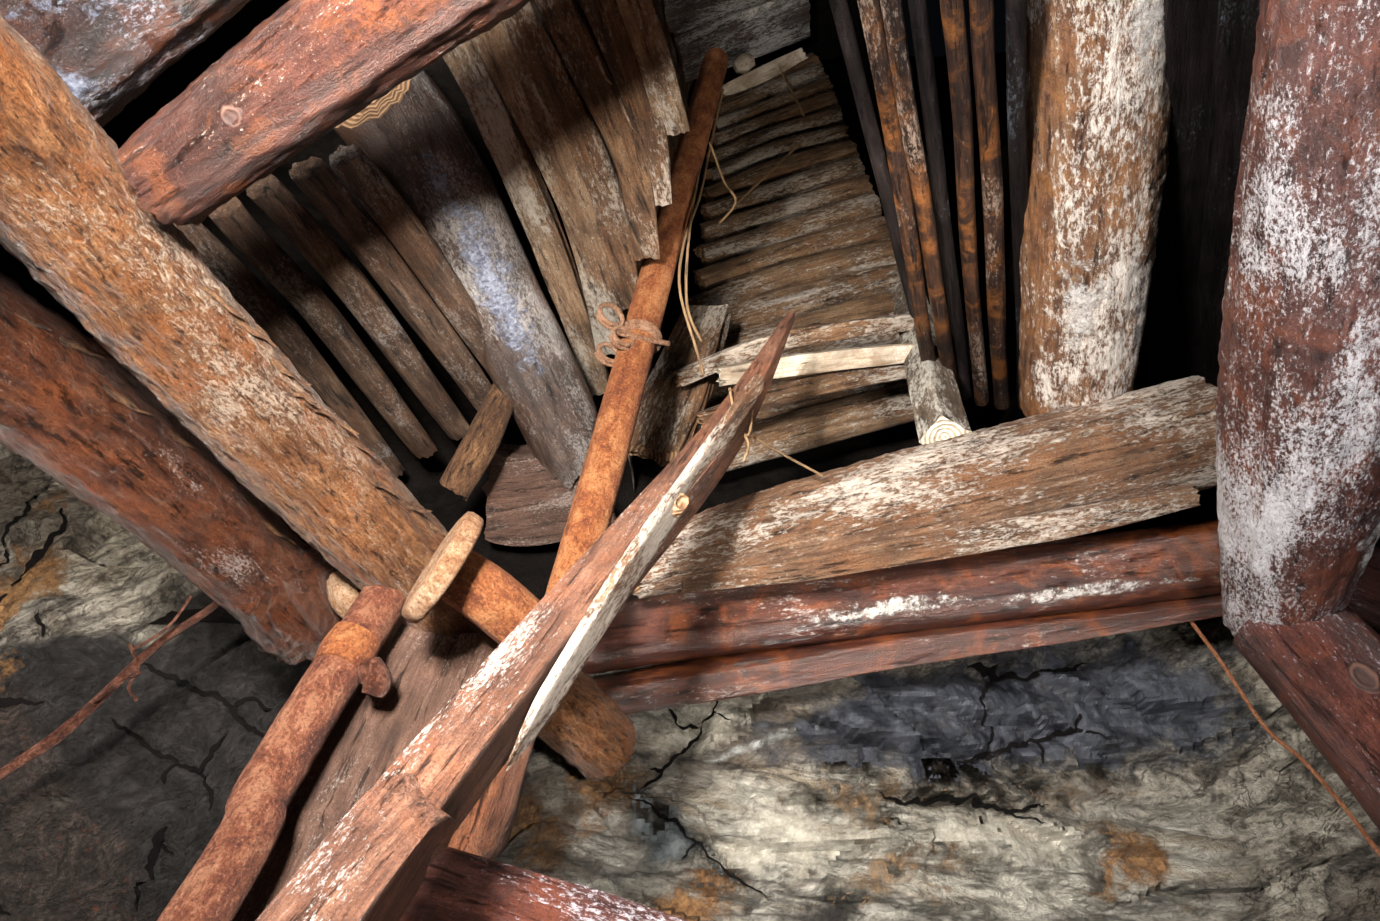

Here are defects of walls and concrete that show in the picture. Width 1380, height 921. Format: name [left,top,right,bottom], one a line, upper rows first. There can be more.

crack [0,487,68,602]
corrosion [0,548,62,630]
crack [34,610,45,637]
crack [0,697,44,707]
crack [111,663,273,811]
crack [879,662,1108,823]
crack [133,825,174,909]